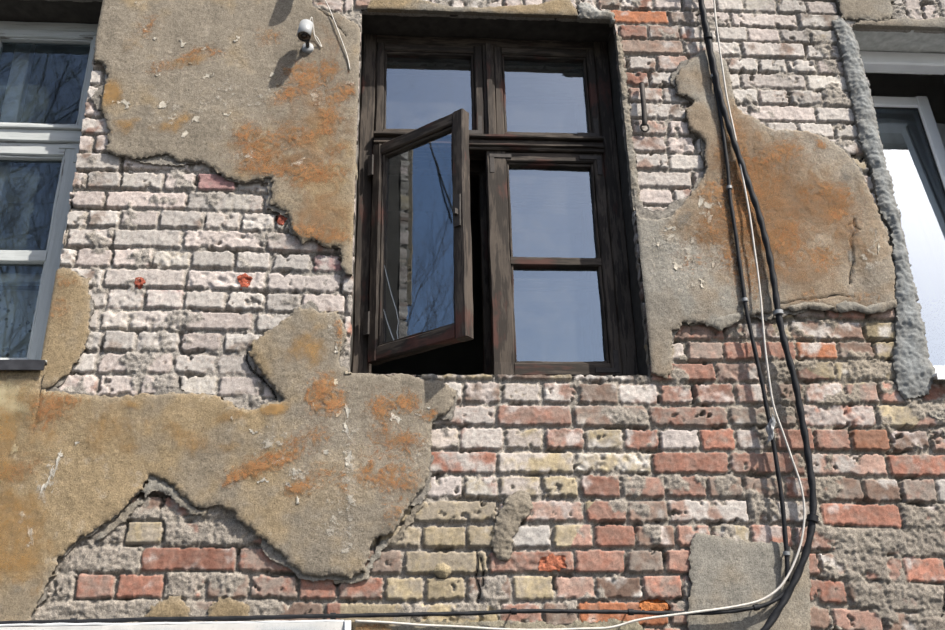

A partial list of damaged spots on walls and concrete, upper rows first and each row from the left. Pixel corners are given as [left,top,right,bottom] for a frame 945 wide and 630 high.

peeling [367,0,578,19]
peeling [834,0,945,31]
peeling [91,0,360,277]
peeling [632,50,897,379]
peeling [0,267,459,627]
spalling [538,553,567,572]
spalling [639,599,671,611]